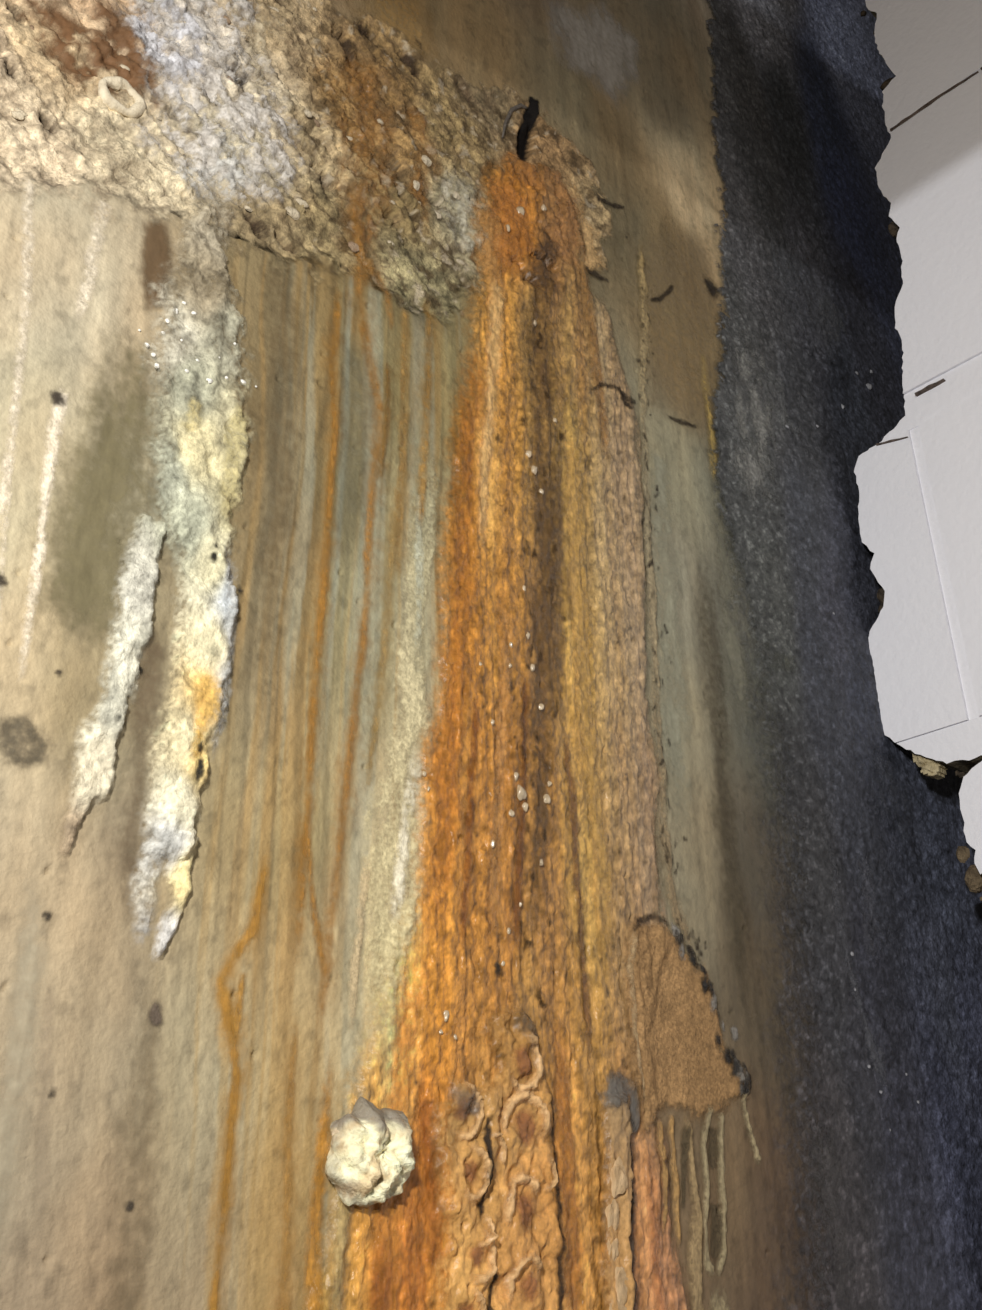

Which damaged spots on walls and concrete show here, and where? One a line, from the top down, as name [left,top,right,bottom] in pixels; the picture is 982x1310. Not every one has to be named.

spalling [0,0,627,323]
leakage [49,0,293,954]
rust [210,869,266,1310]
rust [281,1036,297,1289]
rust [298,800,330,974]
rust [306,152,688,1310]
peeling [637,251,751,1094]